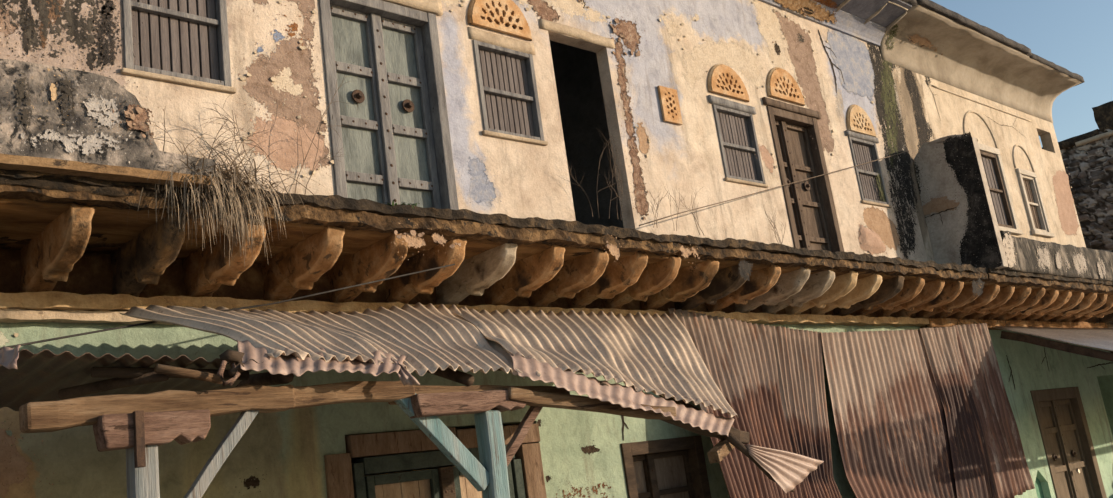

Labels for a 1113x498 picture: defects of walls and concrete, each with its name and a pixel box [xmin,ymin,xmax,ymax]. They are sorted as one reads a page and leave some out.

water stain [0,0,143,148]
peeling [231,0,334,185]
spalling [519,0,653,224]
peeling [655,0,877,162]
water stain [867,43,1002,297]